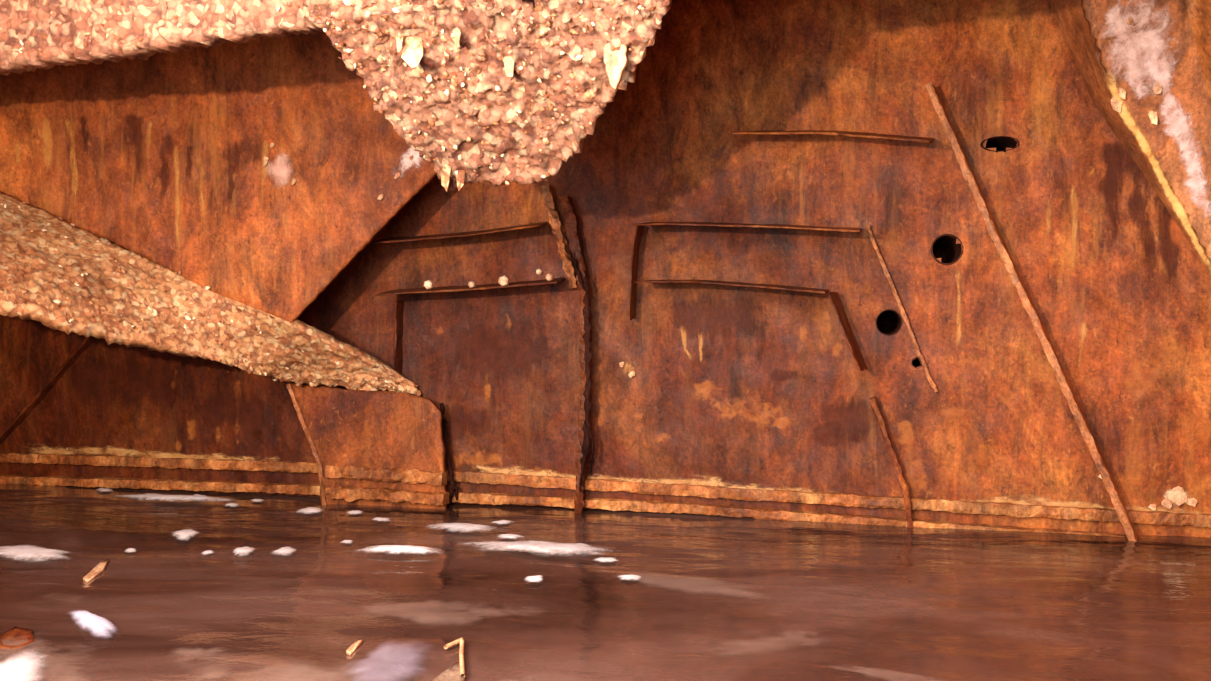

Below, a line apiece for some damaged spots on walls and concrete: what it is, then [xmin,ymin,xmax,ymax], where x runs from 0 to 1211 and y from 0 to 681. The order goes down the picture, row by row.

rust [42,118,53,166]
water stain [129,116,143,170]
water stain [159,137,172,195]
water stain [223,142,257,198]
rust [681,326,702,359]
crack [570,250,595,492]
water stain [39,446,253,460]
water stain [477,466,811,492]
water stain [991,497,1184,513]
rust [1148,486,1198,510]